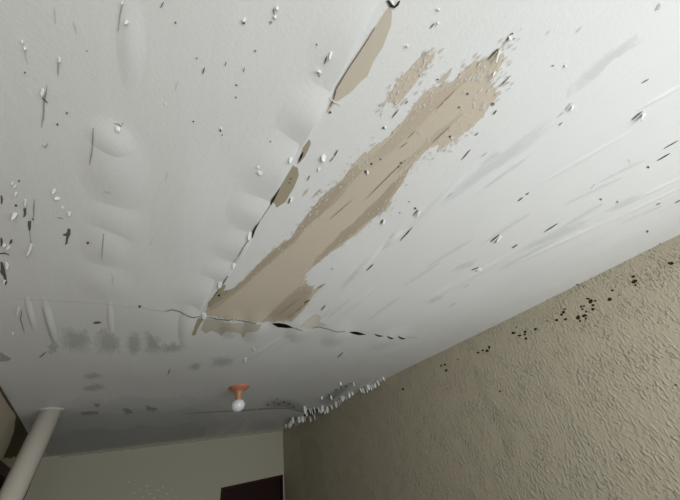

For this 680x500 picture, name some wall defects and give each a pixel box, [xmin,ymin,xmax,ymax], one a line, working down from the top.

crack [330,28,375,106]
peeling [202,48,505,323]
crack [212,241,248,299]
mould [46,321,188,357]
damp [44,372,357,458]